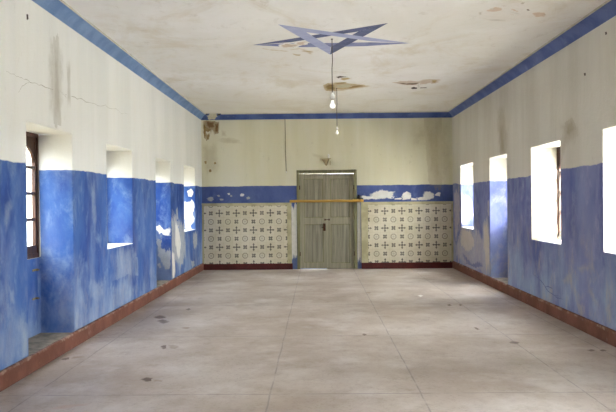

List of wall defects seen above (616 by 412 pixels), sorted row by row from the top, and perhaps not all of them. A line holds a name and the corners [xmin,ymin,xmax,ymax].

water stain [45,23,72,129]
water stain [318,81,375,92]
peeling [156,188,198,278]
peeling [357,189,441,262]